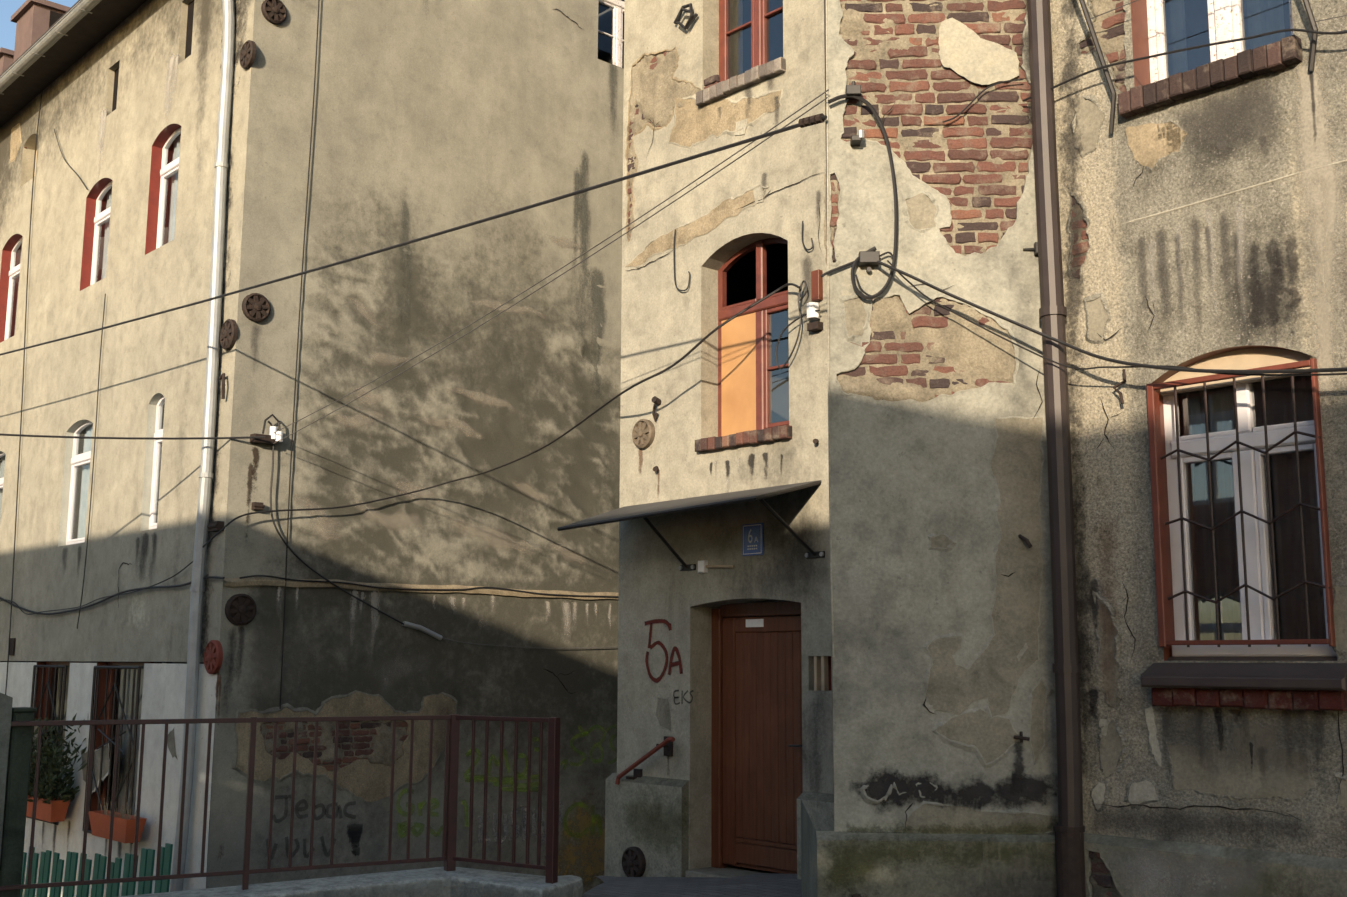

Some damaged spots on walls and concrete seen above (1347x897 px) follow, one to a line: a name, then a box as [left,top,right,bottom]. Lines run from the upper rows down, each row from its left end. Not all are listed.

flaking render [1077,0,1128,93]
flaking render [625,47,783,269]
flaking render [835,0,1033,257]
flaking render [1072,94,1105,158]
leakage [574,155,604,349]
flaking render [824,171,843,267]
leakage [1139,217,1241,299]
flaking render [834,291,1019,403]
leakage [350,589,379,633]
leakage [546,601,611,626]
flaking render [922,416,1054,769]
flaking render [231,690,458,803]